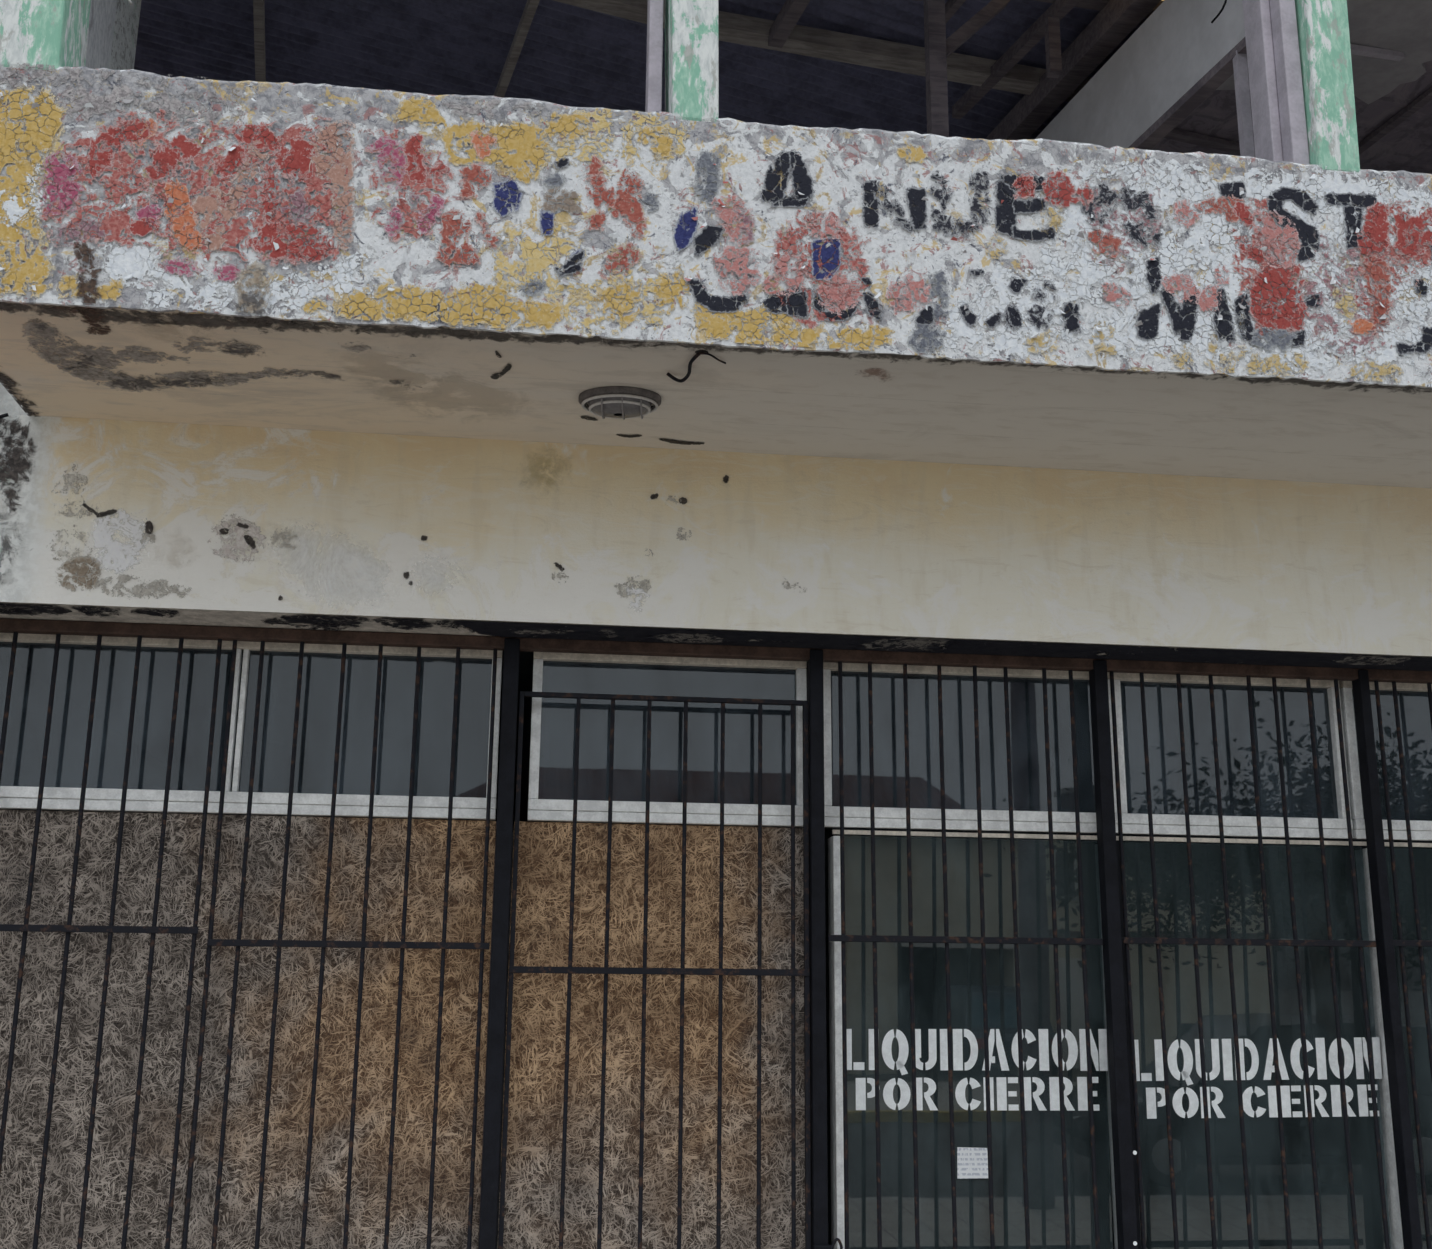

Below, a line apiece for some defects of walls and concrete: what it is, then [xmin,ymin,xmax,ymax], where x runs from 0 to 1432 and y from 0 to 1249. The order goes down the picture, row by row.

peeling [0,62,1432,392]
damp [0,302,1432,393]
damp [0,373,38,578]
peeling [0,464,191,618]
peeling [209,514,300,564]